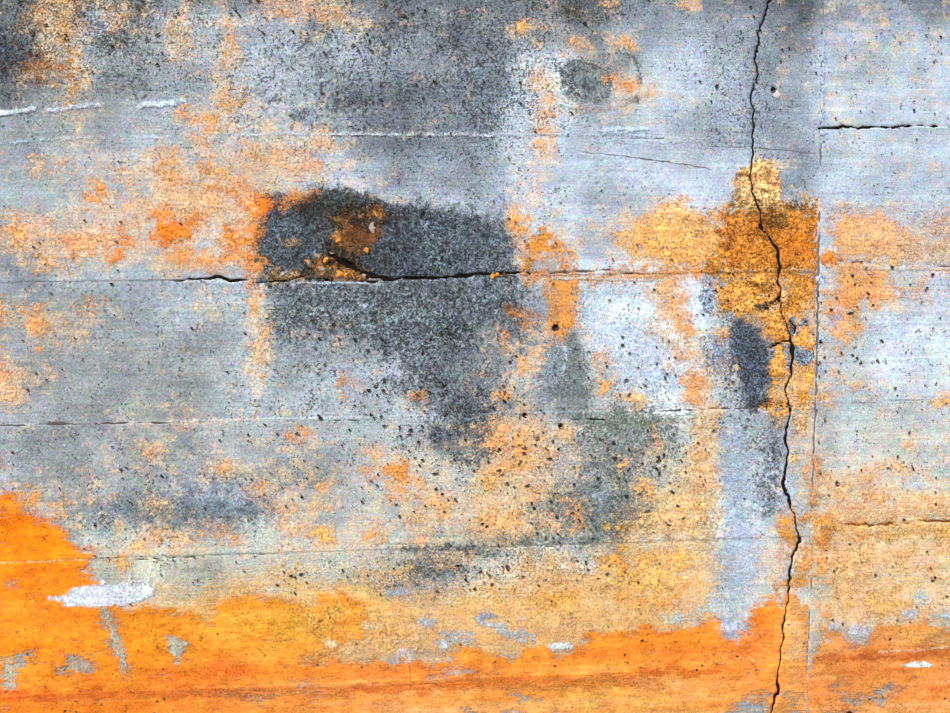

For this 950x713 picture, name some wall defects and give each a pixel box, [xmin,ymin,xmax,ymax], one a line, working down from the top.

rust [0,83,333,317]
crack [174,252,530,284]
leakage [247,183,698,599]
rust [0,158,950,713]
crack [583,0,809,712]
leakage [698,276,719,311]
leakage [659,316,814,641]
crack [818,123,950,131]
leakage [417,611,536,652]
efflorescence [547,641,573,652]